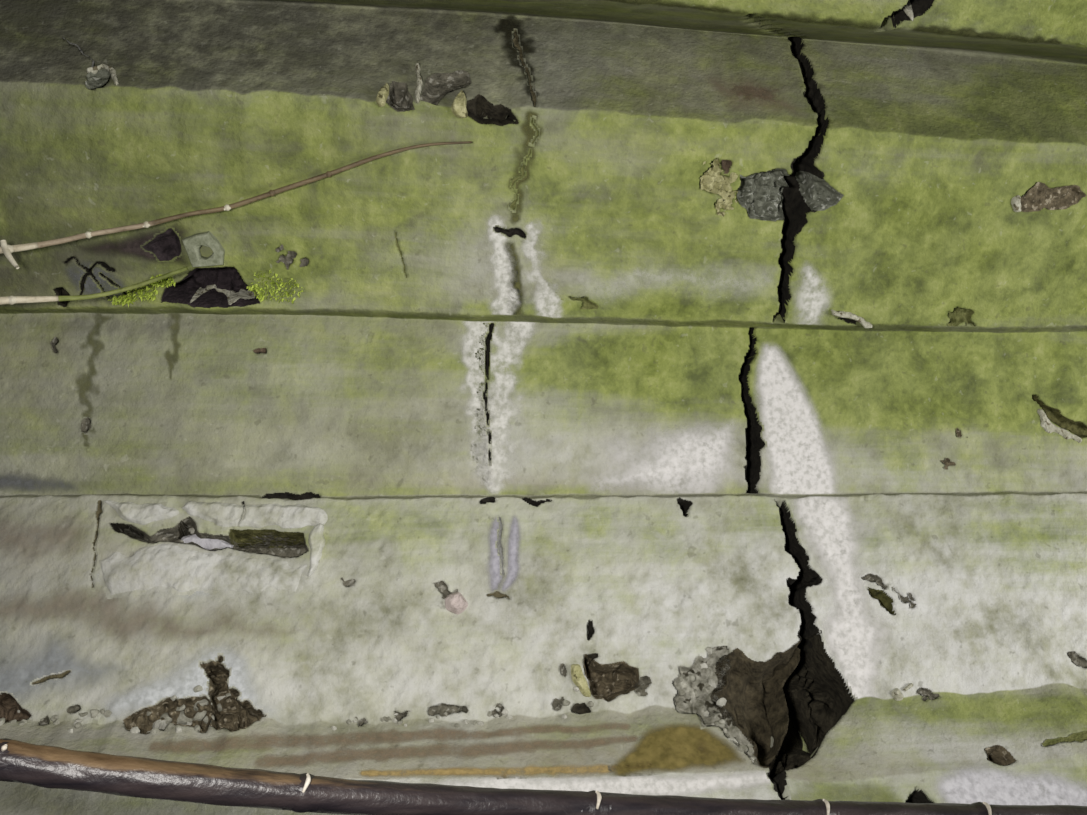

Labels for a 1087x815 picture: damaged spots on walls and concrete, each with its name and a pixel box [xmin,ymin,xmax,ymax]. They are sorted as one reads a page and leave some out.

crack [881,0,934,28]
spalling [376,63,519,126]
spalling [700,159,844,222]
crack [463,16,561,507]
leakage [798,267,828,324]
crack [738,16,829,671]
leakage [758,346,885,699]
spalling [123,655,266,735]
spalling [552,653,652,719]
spalling [673,630,854,780]
crack [767,750,788,800]
crack [906,789,935,803]